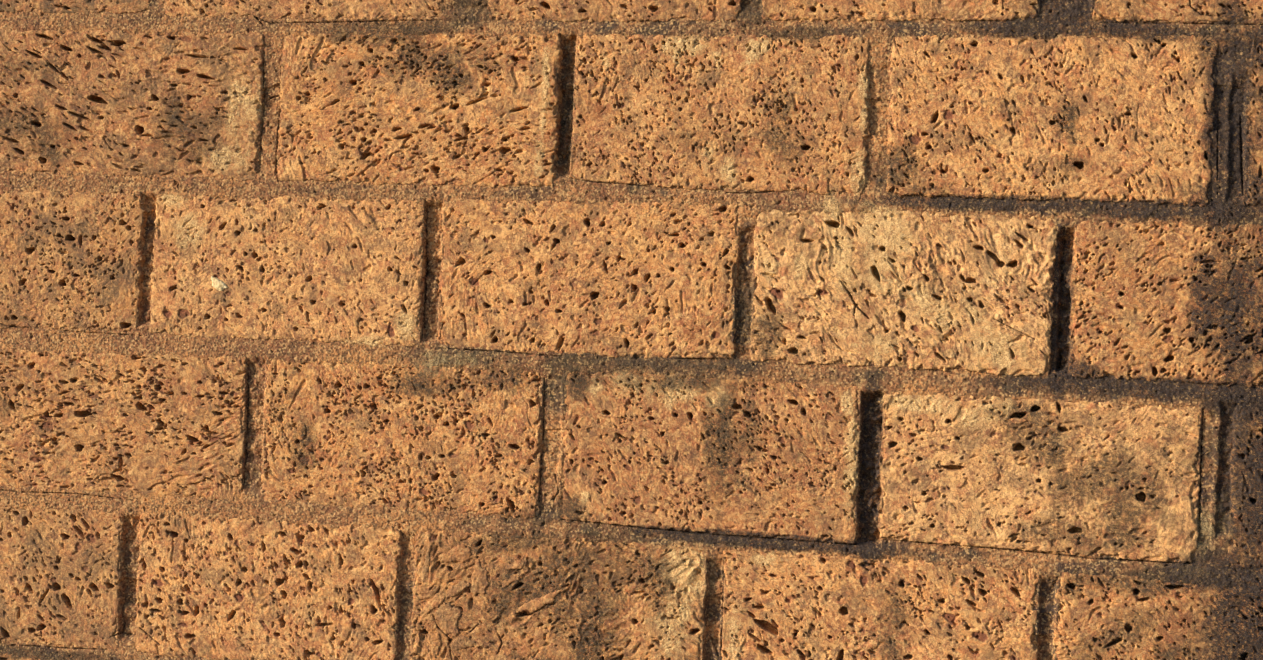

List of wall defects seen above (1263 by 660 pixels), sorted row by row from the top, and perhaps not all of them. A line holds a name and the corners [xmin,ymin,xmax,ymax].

leakage [470,0,1263,660]